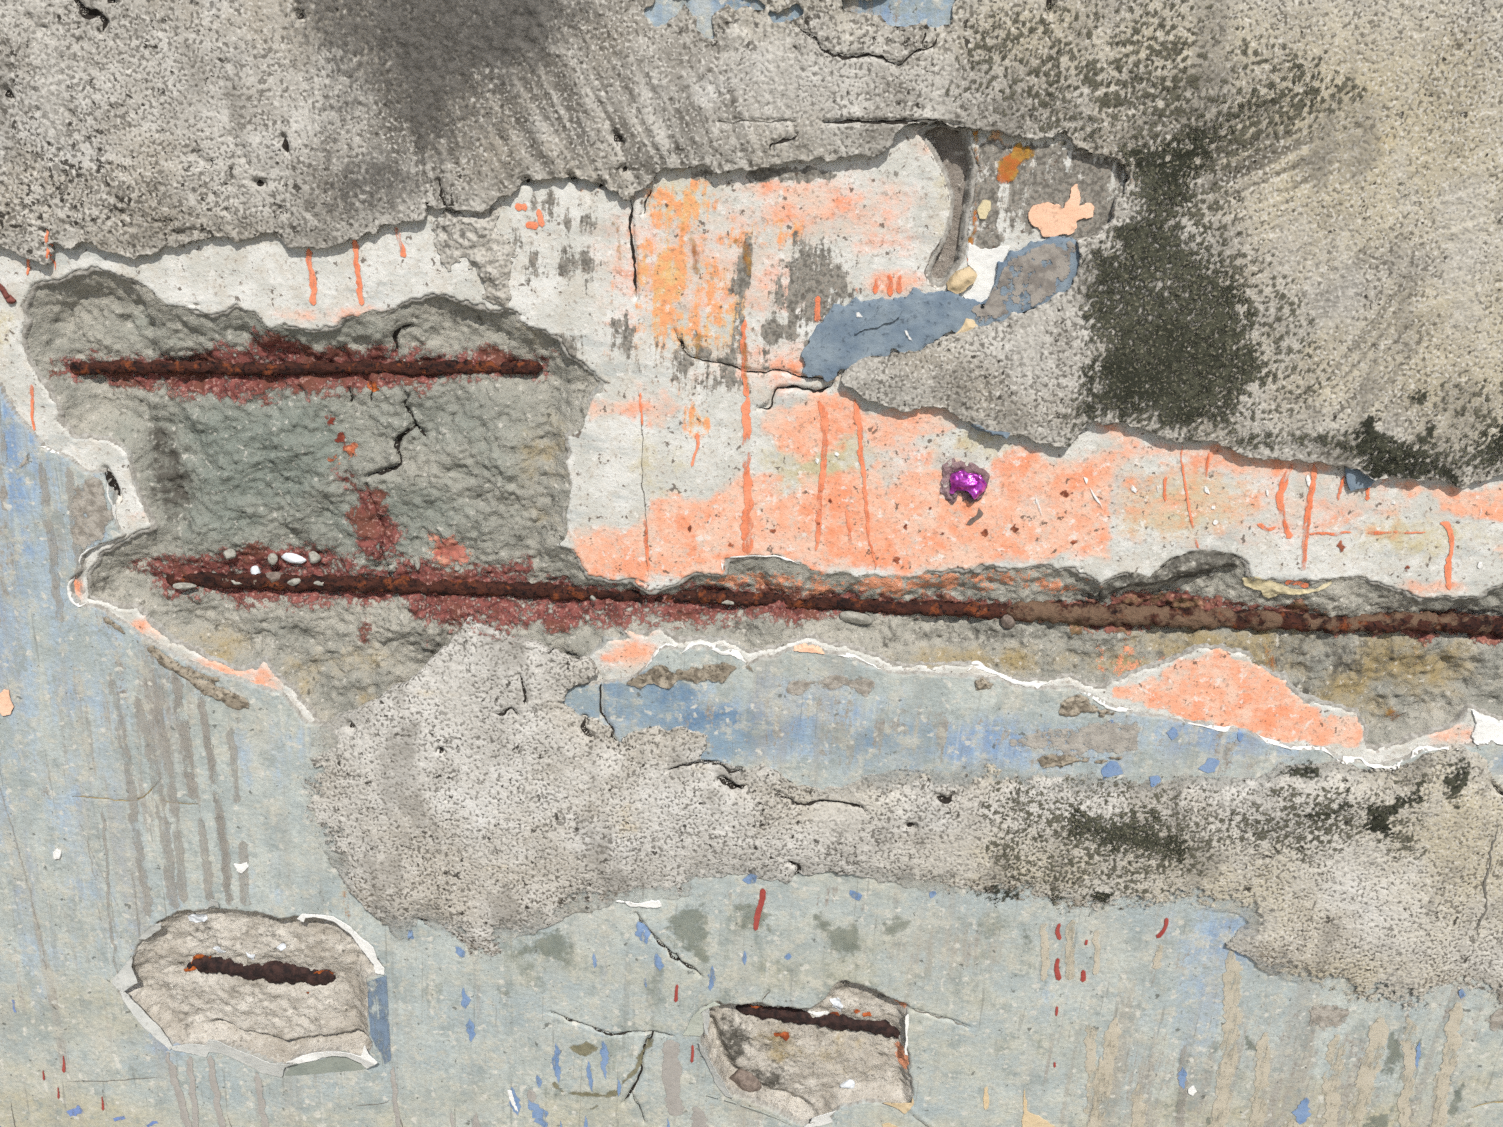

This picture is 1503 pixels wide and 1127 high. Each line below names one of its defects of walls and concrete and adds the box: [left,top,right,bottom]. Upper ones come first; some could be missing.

leakage [945,0,1503,487]
corrosion [49,325,1012,646]
peeling [0,122,1503,770]
corrosion [1048,588,1503,648]
crack [668,760,865,811]
peeling [1101,761,1123,779]
peeling [1199,758,1220,773]
spalling [111,899,391,1078]
peeling [616,900,664,971]
crack [552,1012,673,1119]
spalling [683,966,914,1127]